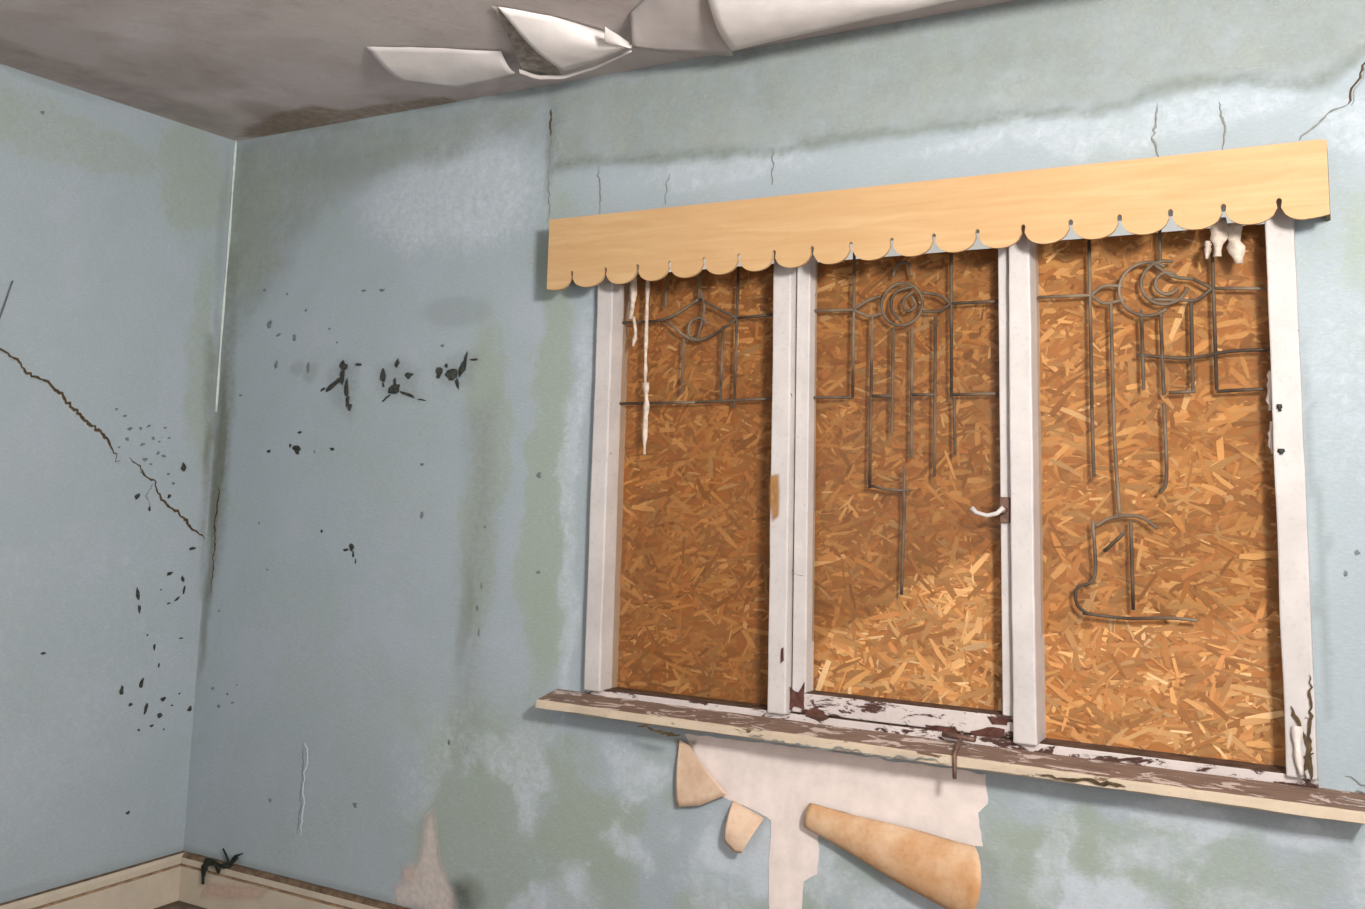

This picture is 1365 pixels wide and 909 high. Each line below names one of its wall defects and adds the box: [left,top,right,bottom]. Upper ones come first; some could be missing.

crack [1299,62,1365,141]
crack [0,348,220,592]
damp [115,408,187,498]
damp [119,678,192,731]
flaking render [395,814,453,909]
flaking render [637,724,988,909]
peeling [1037,774,1126,787]